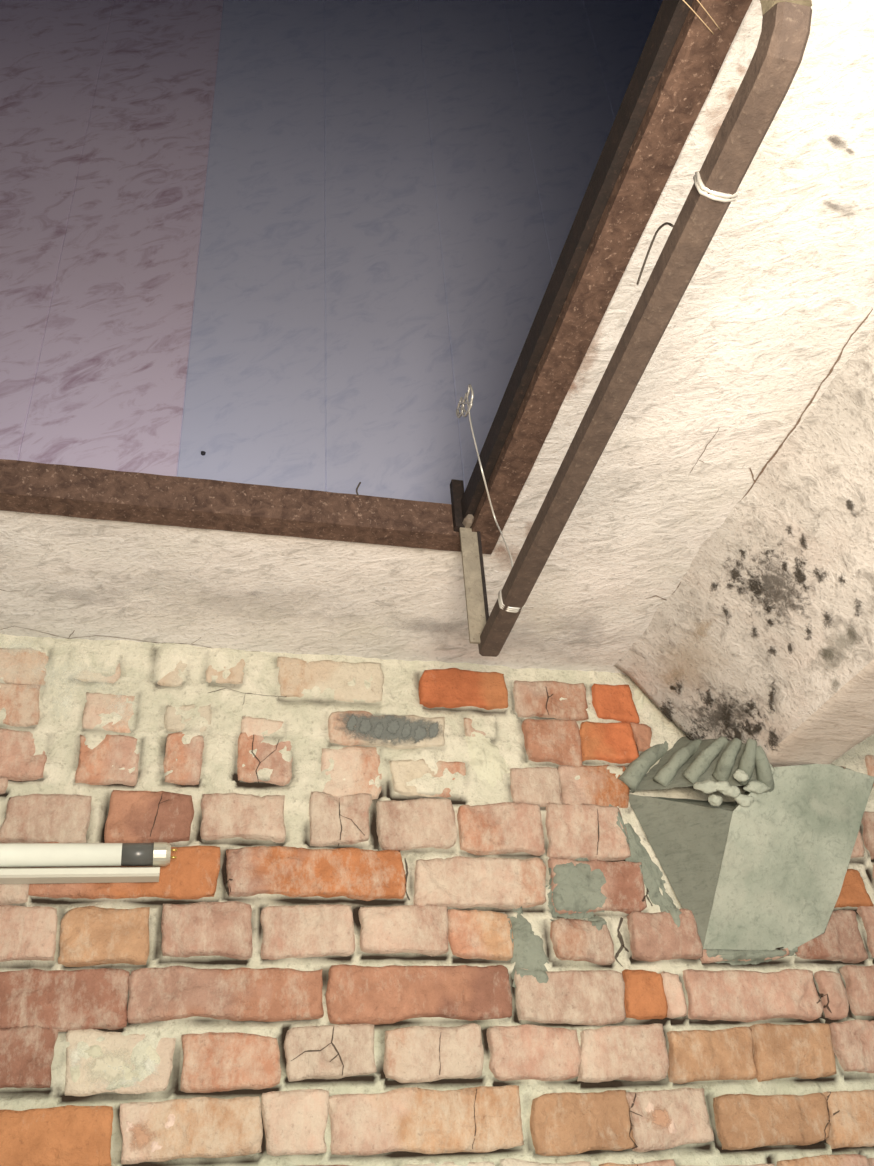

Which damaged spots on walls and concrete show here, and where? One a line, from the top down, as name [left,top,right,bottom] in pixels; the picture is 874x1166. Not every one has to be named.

damp [711,526,845,637]
damp [660,681,778,751]
crack [291,1027,344,1075]